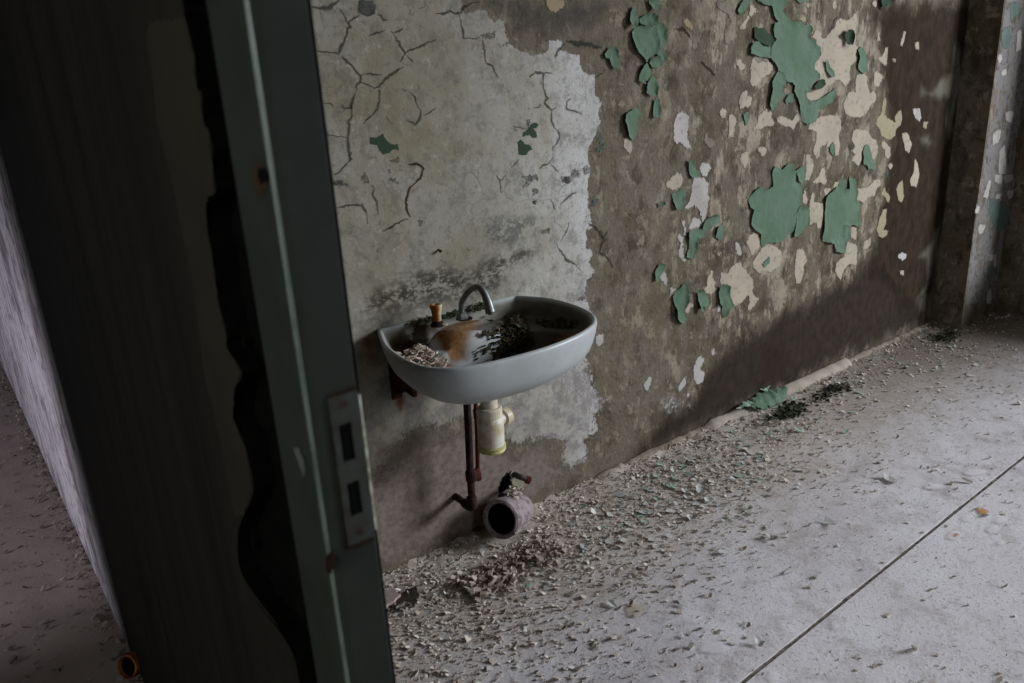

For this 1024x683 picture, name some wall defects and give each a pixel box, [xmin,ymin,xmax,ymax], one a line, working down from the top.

crack [338,163,425,231]
crack [312,0,498,175]
crack [497,40,602,193]
crack [550,192,613,267]
peeling [605,47,620,69]
peeling [623,0,668,155]
peeling [655,0,928,324]
peeling [966,0,1024,305]
peeling [678,348,717,398]